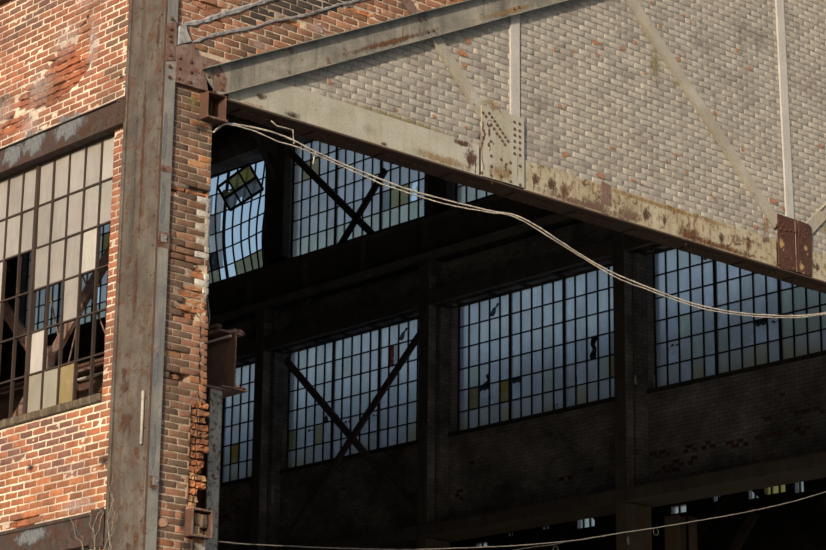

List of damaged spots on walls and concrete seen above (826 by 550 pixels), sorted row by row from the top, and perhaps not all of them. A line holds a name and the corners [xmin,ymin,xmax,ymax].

spalling [0,33,94,168]
corrosion [429,120,518,182]
peeling [171,185,209,252]
corrosion [532,169,754,257]
spalling [174,265,208,320]
spalling [187,401,210,507]